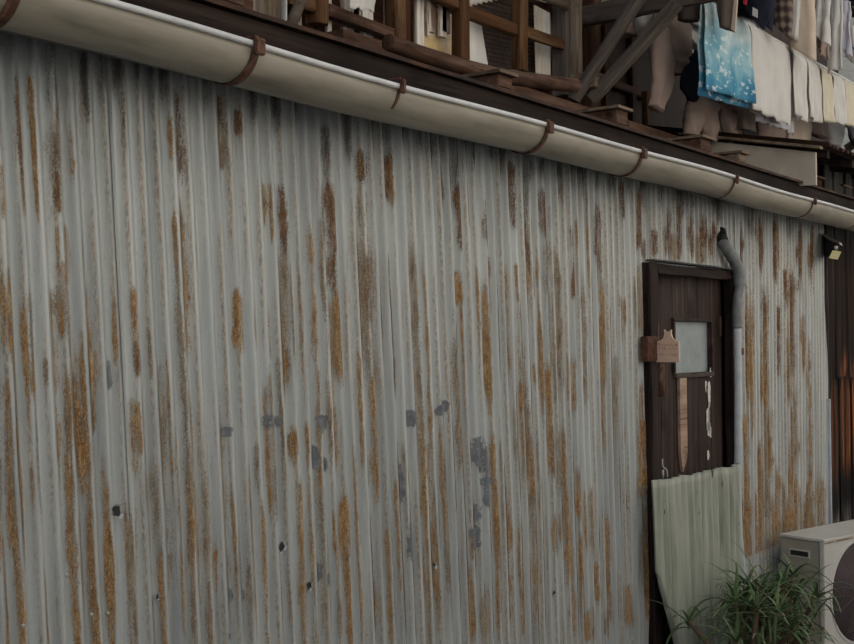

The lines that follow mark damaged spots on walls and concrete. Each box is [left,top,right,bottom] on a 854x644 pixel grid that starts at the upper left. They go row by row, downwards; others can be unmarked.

rust [13,72,76,221]
rust [70,51,190,183]
rust [217,91,257,172]
rust [0,225,116,644]
rust [129,114,721,644]
rust [733,209,826,556]
rust [122,497,138,644]